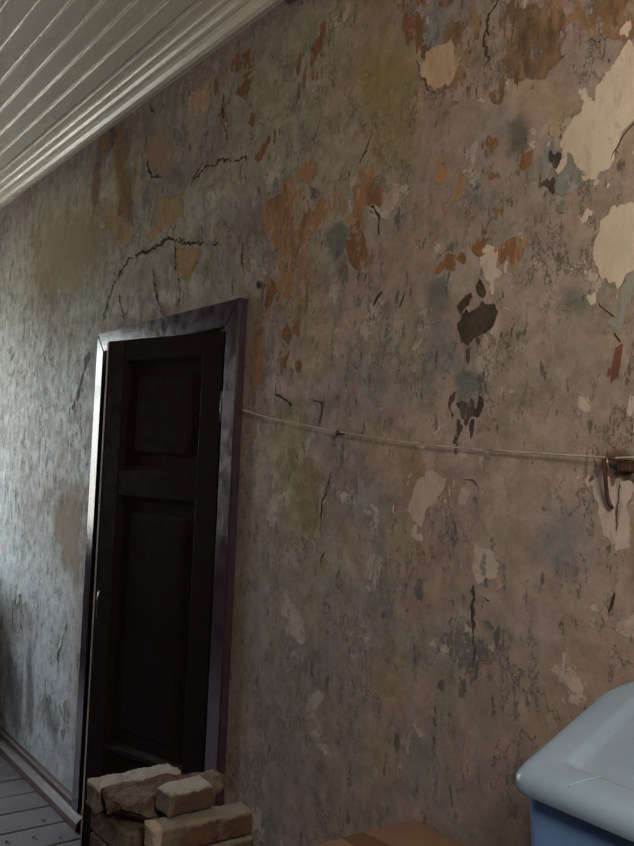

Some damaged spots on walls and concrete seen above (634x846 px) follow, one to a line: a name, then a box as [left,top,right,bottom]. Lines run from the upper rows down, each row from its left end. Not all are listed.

peeling [332,163,384,275]
crack [100,228,228,330]
peeling [584,465,634,562]
peeling [456,535,503,591]
peeling [431,621,489,698]